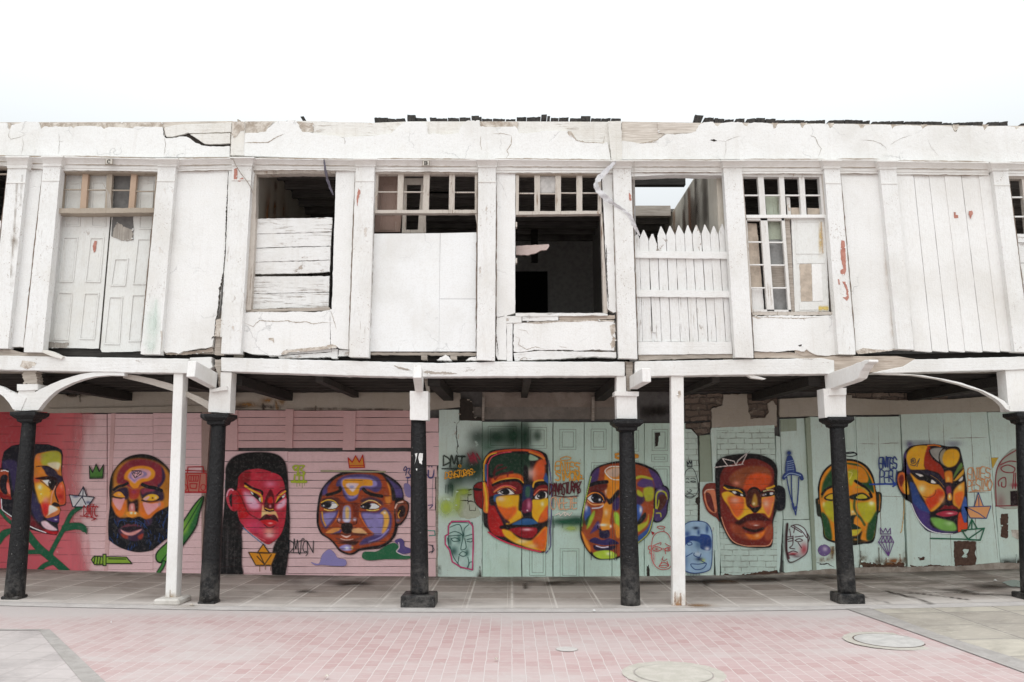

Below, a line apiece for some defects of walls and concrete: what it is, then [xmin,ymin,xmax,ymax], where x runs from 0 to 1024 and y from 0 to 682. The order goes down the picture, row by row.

flaking render [231,121,274,137]
flaking render [297,122,314,132]
flaking render [657,122,701,134]
crack [163,128,283,153]
crack [186,181,228,352]
crack [245,313,336,327]
flaking render [677,391,777,436]